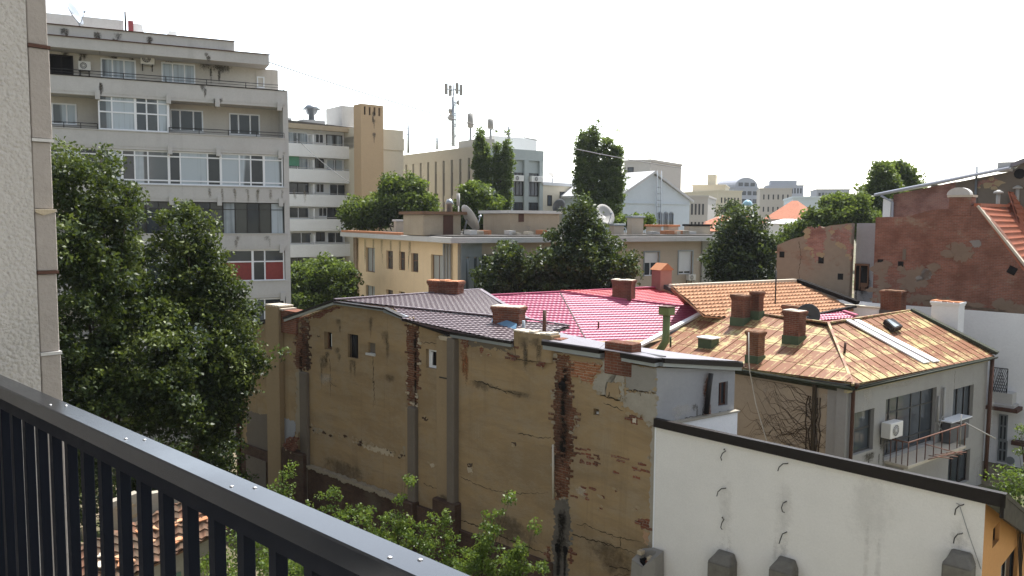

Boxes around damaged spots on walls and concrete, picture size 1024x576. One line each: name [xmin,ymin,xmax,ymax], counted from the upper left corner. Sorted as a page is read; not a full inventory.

peeling [802,223,854,263]
peeling [966,301,1024,314]
peeling [404,317,428,421]
peeling [536,352,659,576]